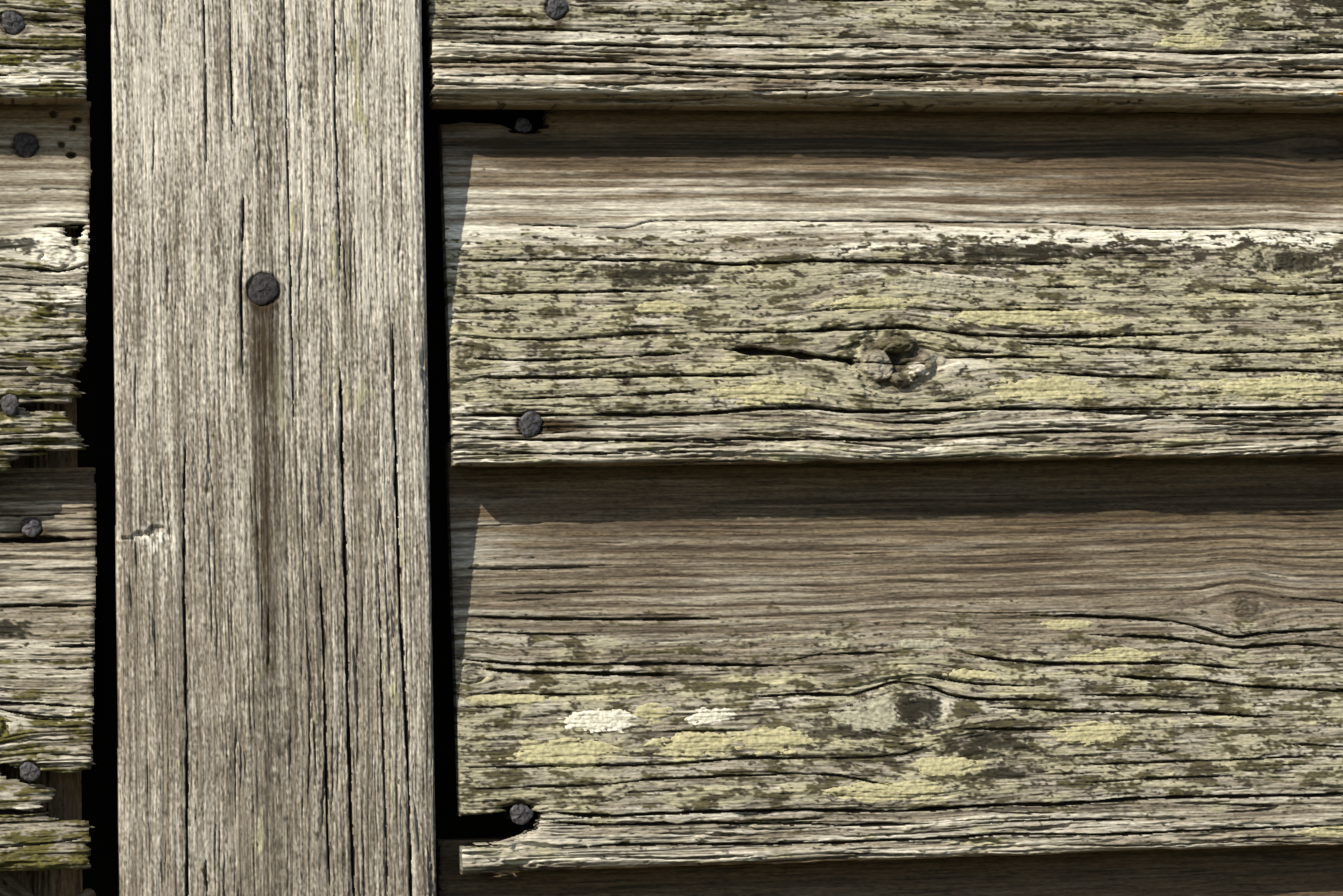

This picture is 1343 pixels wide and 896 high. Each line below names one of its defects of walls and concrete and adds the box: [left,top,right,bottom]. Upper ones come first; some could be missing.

crack [768,217,1022,225]
crack [463,220,1343,456]
crack [465,567,1343,849]